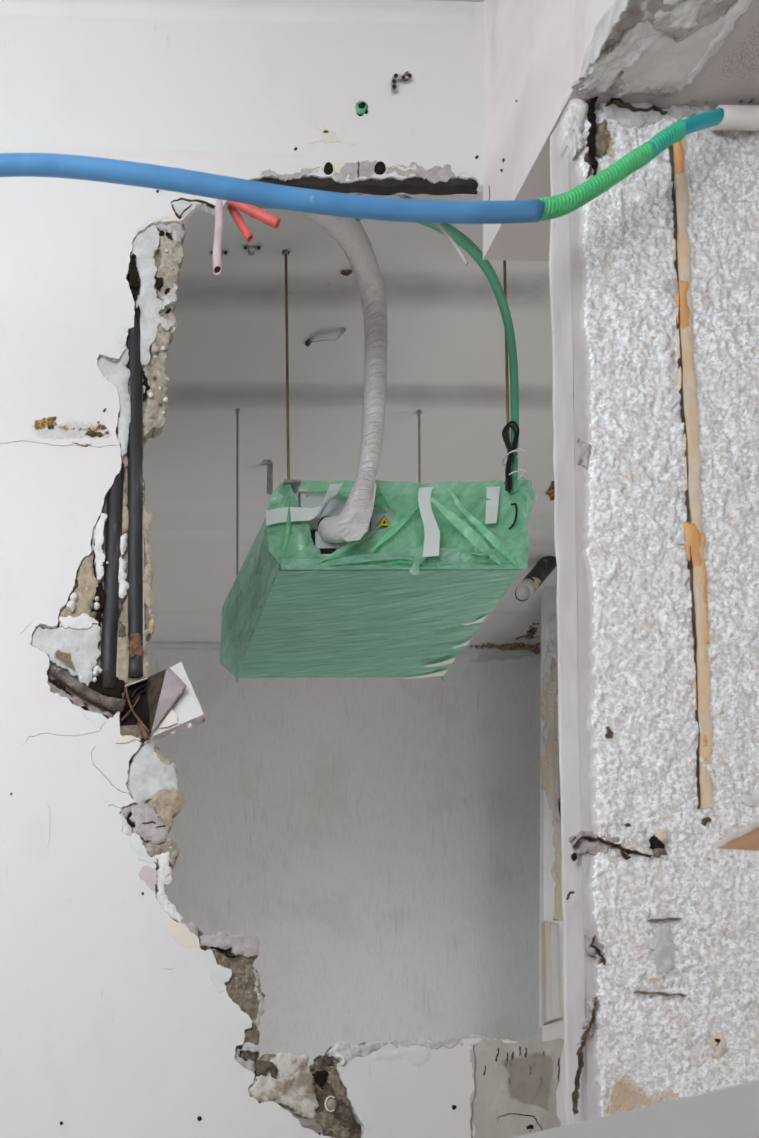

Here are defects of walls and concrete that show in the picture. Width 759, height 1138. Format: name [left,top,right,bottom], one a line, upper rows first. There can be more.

spalling [557,0,752,161]
crack [584,97,668,178]
spalling [261,160,466,184]
spalling [97,222,185,460]
rust [34,408,109,447]
spalling [91,583,106,628]
rust [470,623,540,654]
spalling [88,675,125,699]
crack [571,836,654,862]
flaking render [116,734,597,1138]
crack [590,935,606,965]
crack [572,996,598,1115]